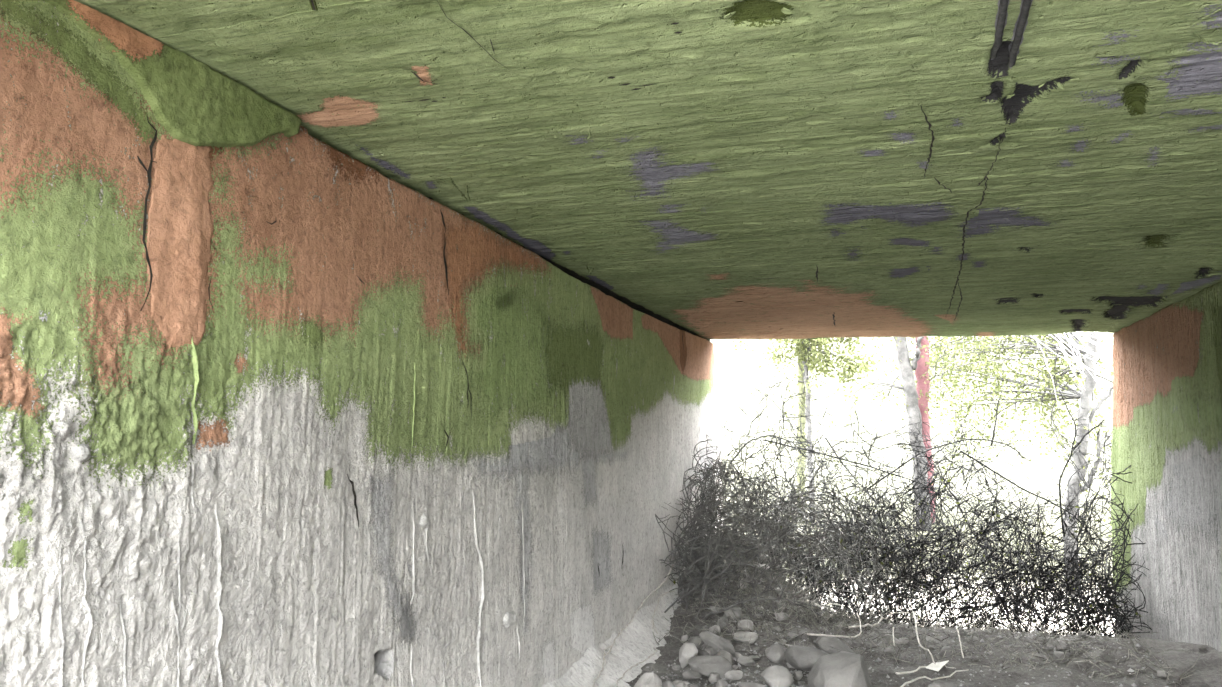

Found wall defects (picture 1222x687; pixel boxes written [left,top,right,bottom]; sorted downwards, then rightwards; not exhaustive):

spalling [718,0,794,28]
spalling [981,0,1080,147]
crack [137,117,157,311]
crack [920,105,1006,321]